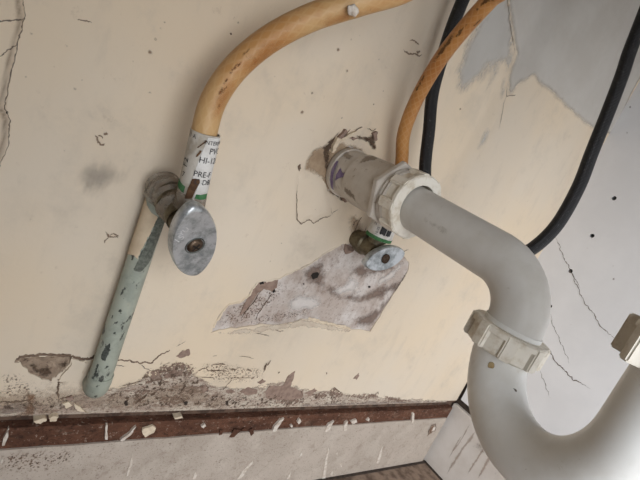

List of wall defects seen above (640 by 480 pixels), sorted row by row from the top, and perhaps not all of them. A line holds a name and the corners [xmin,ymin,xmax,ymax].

peeling [500,0,640,133]
spalling [306,127,378,202]
peeling [212,244,409,336]
crack [555,237,614,338]
crack [116,342,184,371]
peeling [0,344,447,424]
crack [550,321,586,386]